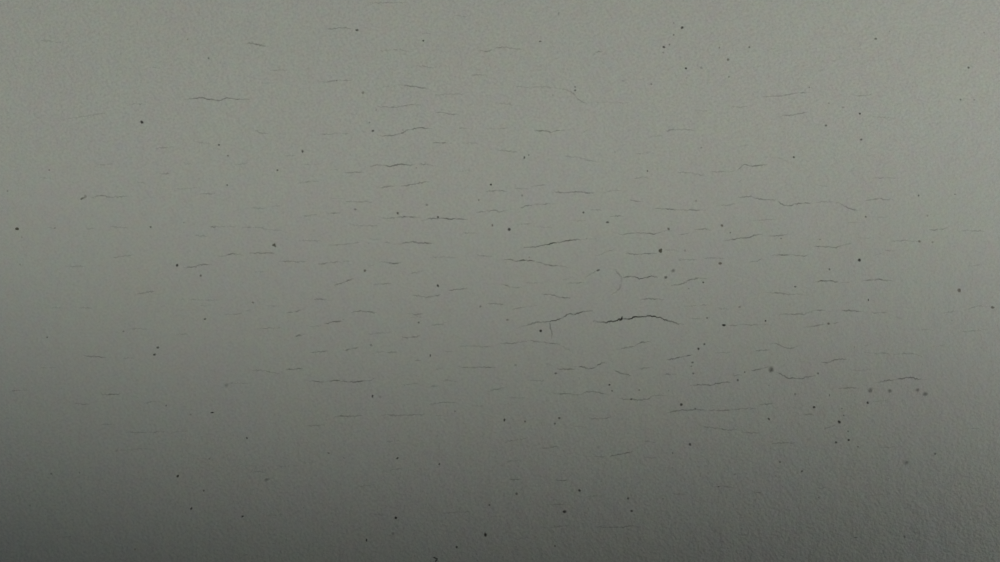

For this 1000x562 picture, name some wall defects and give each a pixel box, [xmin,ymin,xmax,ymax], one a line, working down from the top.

crack [518,311,683,329]